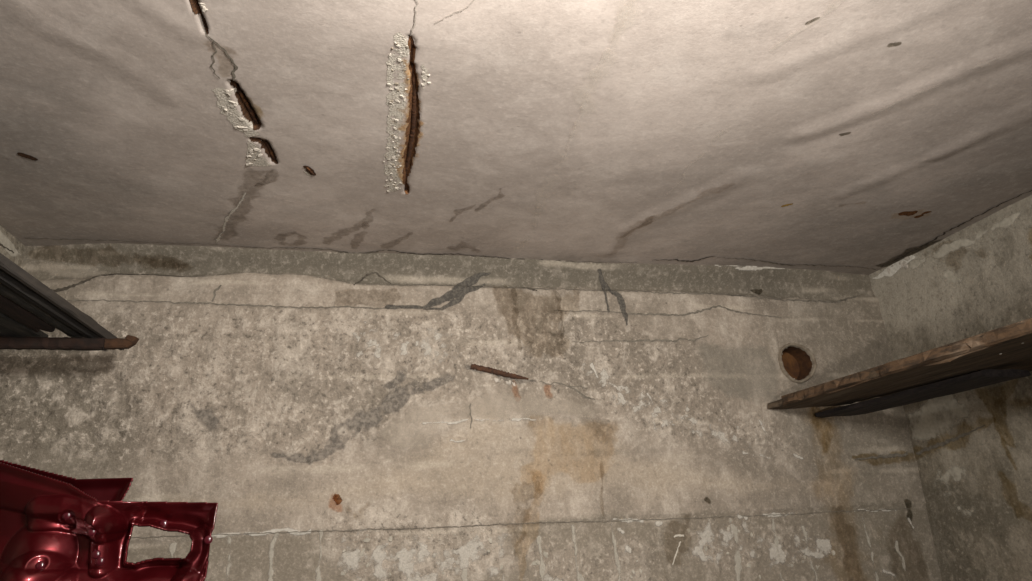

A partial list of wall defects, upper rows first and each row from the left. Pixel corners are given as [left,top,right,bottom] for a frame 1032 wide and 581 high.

spalling [189,0,209,34]
crack [410,0,474,36]
spalling [213,80,278,167]
spalling [383,32,431,194]
crack [0,190,1032,309]
crack [482,286,860,343]